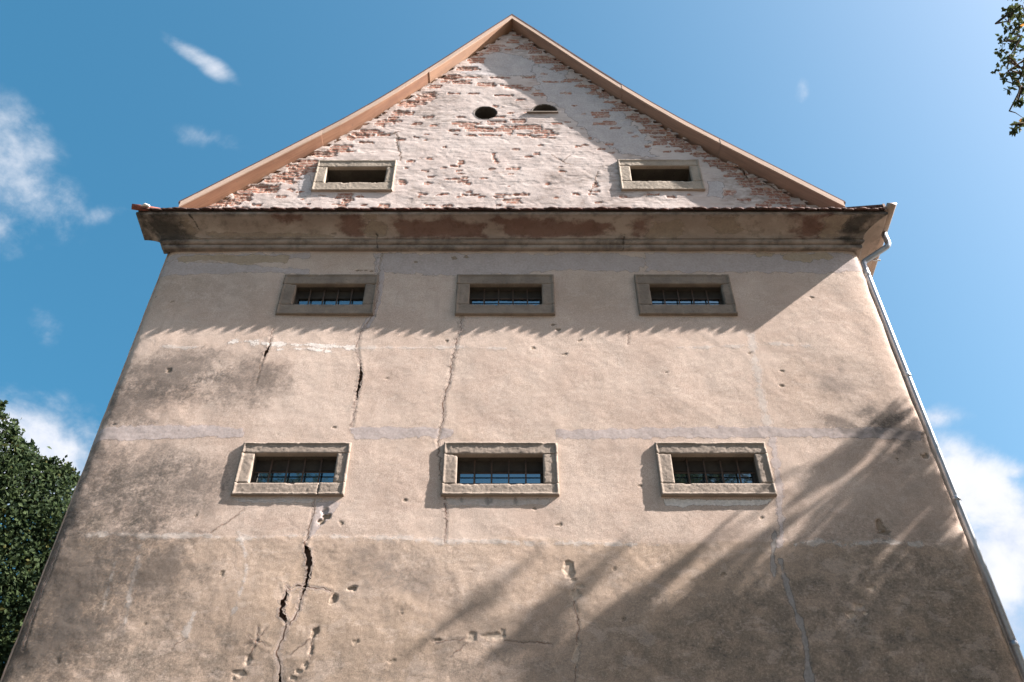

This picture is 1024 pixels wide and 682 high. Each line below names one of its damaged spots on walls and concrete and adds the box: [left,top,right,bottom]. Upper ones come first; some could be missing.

flaking render [209,34,806,208]
crack [257,328,275,379]
crack [349,233,384,427]
crack [247,499,332,682]